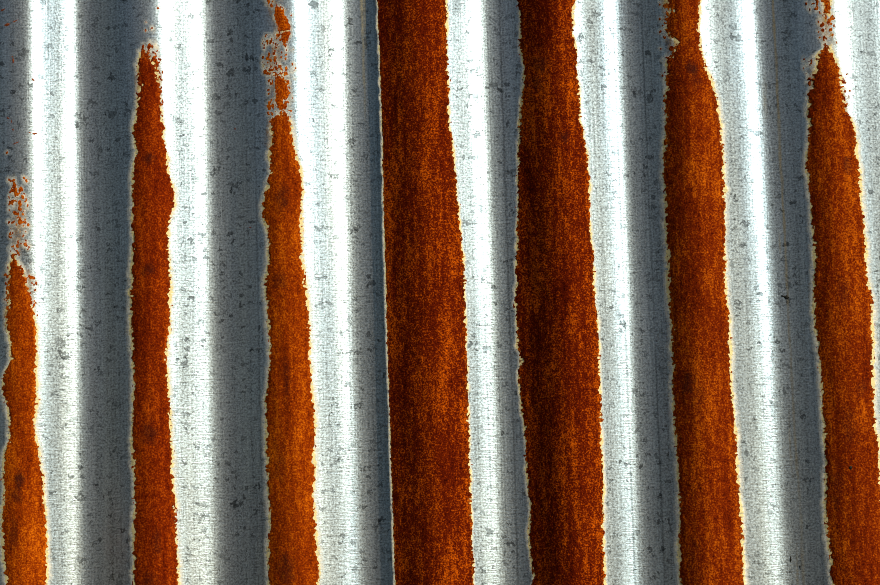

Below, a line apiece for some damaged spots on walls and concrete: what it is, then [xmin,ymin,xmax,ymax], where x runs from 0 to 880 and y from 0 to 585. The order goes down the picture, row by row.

rust [0,176,52,585]
rust [126,43,183,585]
rust [259,0,323,585]
rust [376,0,476,585]
rust [513,0,608,585]
rust [659,0,748,585]
rust [803,0,880,585]